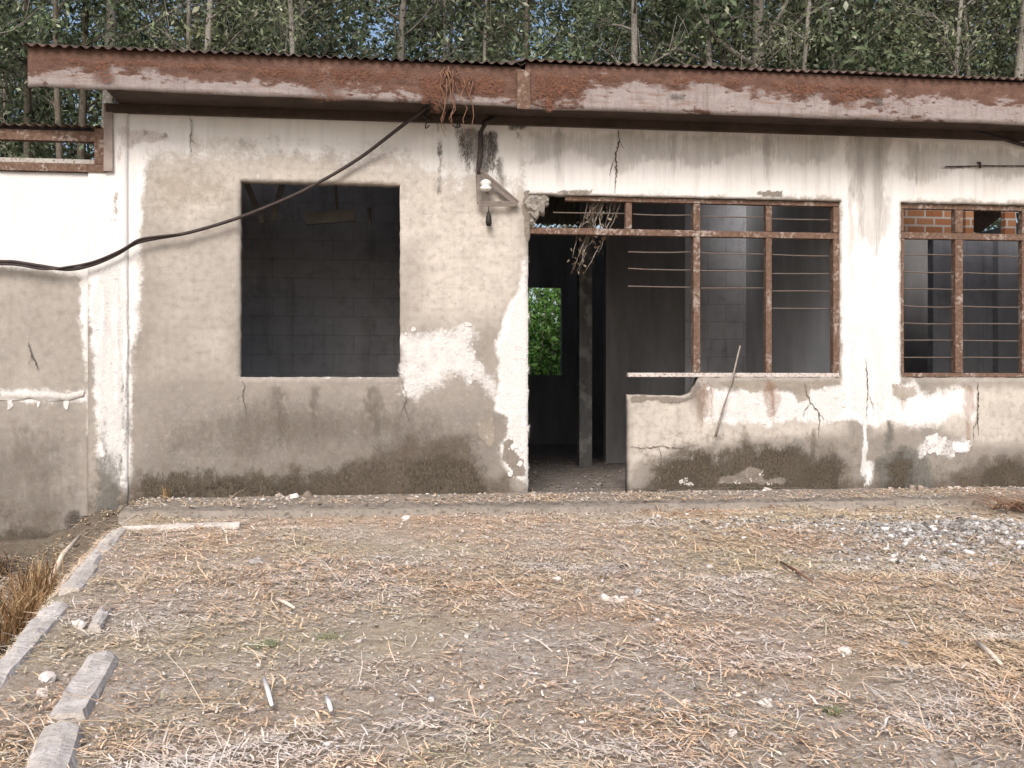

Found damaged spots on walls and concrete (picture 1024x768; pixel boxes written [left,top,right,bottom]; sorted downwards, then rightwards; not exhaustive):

water stain [488,132,503,181]
crack [610,131,623,186]
flaking render [522,190,592,241]
peeling [400,282,529,479]
crack [803,387,824,436]
crack [972,382,980,442]
water stain [860,406,874,486]
peeling [919,433,971,458]
water stain [141,460,406,498]